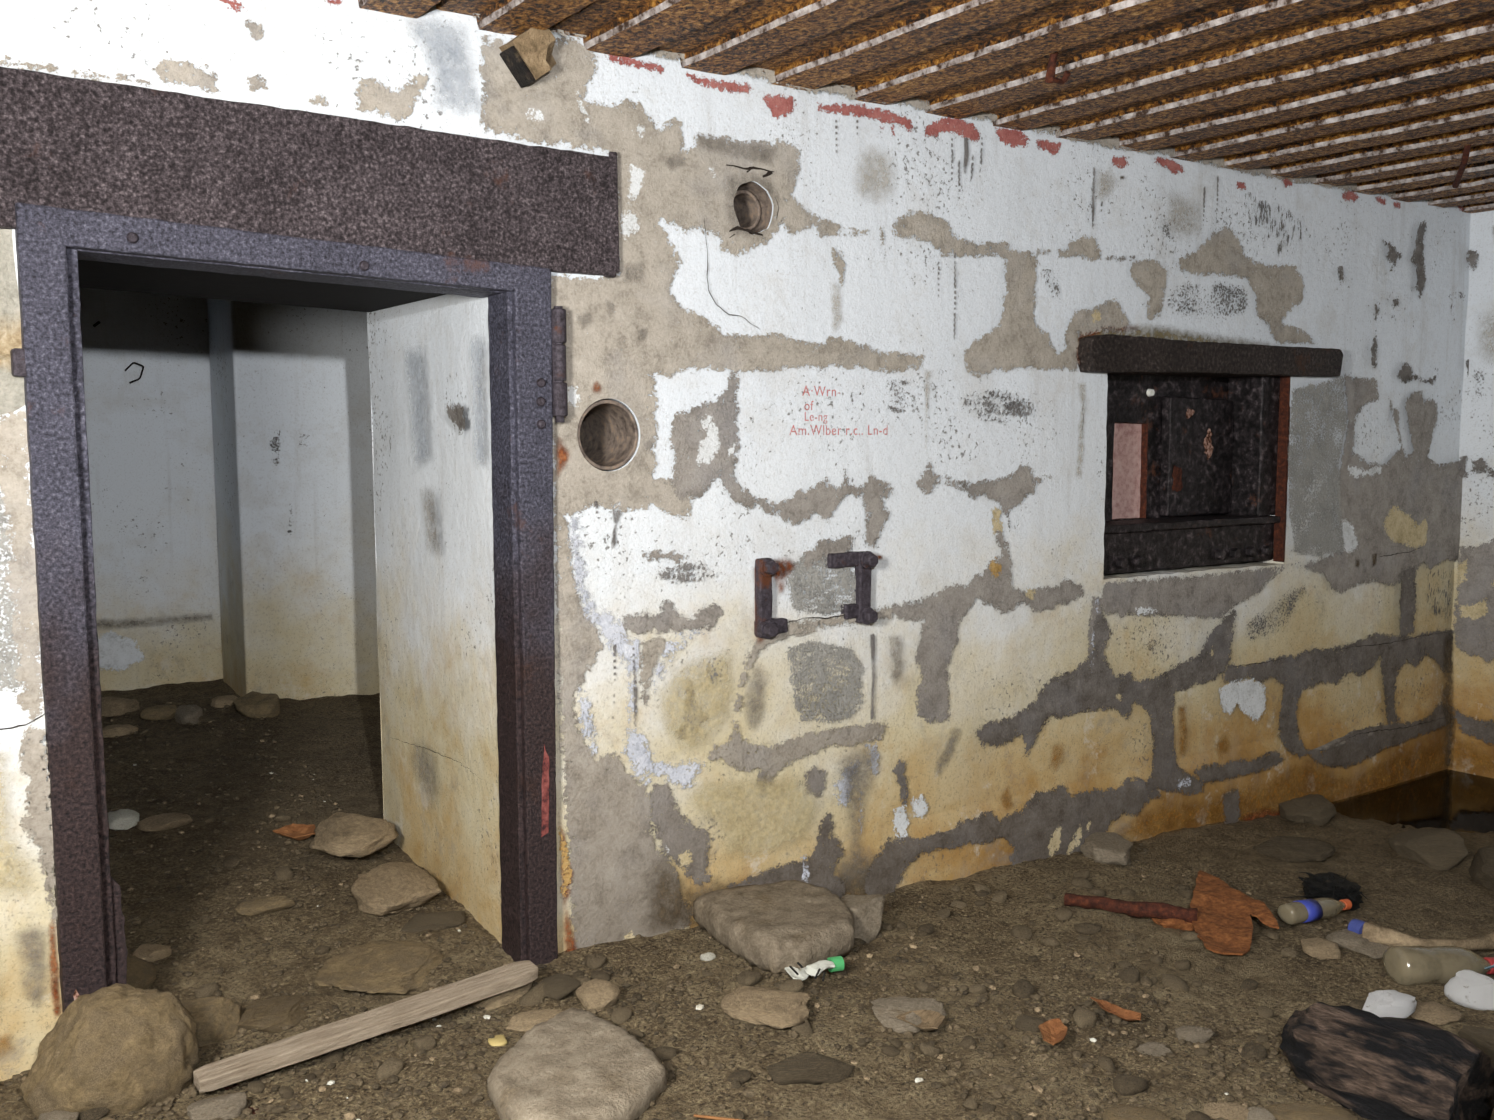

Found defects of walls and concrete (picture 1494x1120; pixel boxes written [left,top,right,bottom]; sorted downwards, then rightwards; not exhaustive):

flaking render [473,13,1494,949]
peeling [0,229,58,924]
corrosion [775,561,793,590]
damp [569,501,812,852]
damp [871,634,901,719]
damp [1218,678,1266,722]
damp [1442,639,1455,765]
damp [833,744,880,833]
damp [892,793,929,839]
damp [655,872,728,927]
damp [22,930,41,997]
spalling [700,952,716,961]